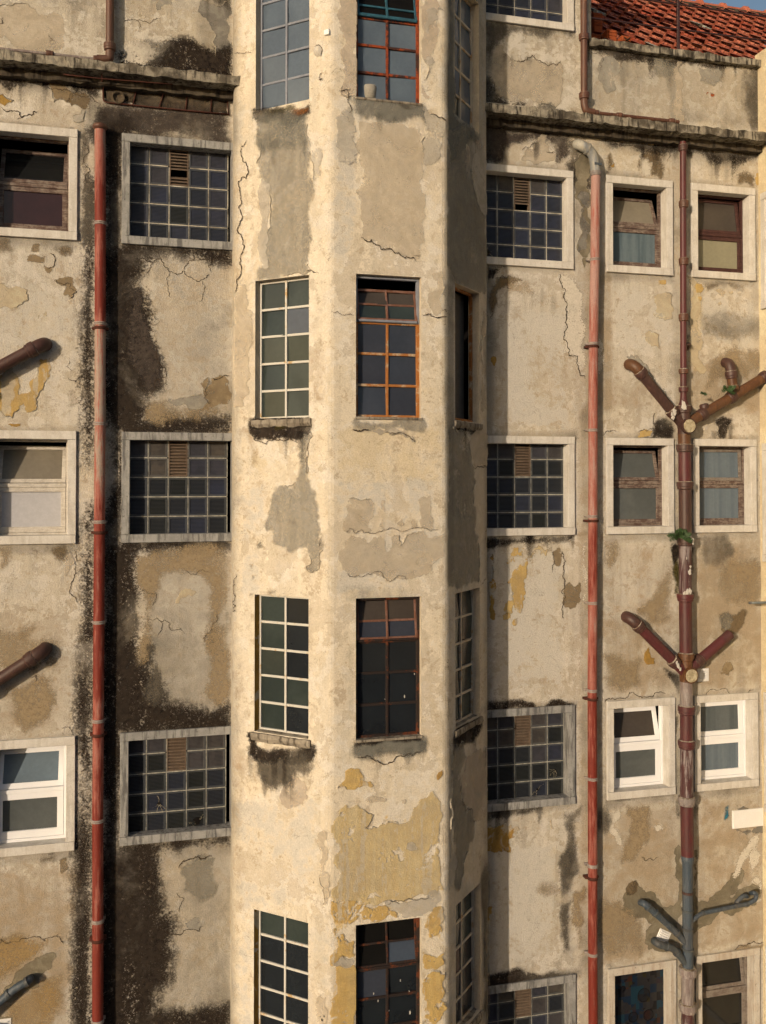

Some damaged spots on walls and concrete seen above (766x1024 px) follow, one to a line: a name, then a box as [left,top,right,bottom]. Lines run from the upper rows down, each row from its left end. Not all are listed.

peeling [0,2,64,47]
water stain [118,36,233,76]
water stain [0,78,49,91]
water stain [253,104,310,153]
crack [559,275,585,376]
water stain [248,417,312,441]
peeling [265,431,323,573]
water stain [32,85,232,1024]
peeling [562,582,581,609]
water stain [247,732,316,778]
water stain [353,736,426,759]
peeling [313,740,520,1024]